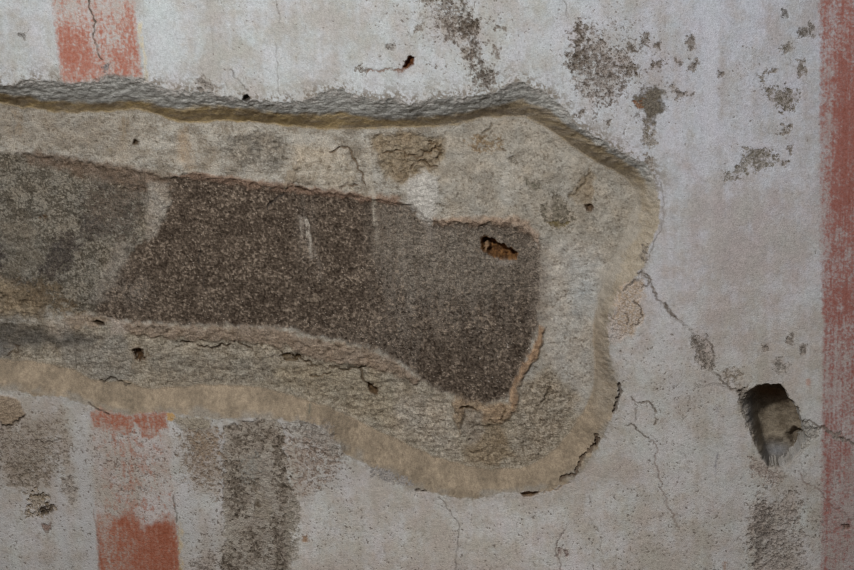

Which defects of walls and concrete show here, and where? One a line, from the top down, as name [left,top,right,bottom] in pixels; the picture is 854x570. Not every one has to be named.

crack [87,0,111,74]
spalling [650,33,701,73]
spalling [665,84,695,102]
spalling [721,19,821,185]
spalling [0,0,662,570]
crack [637,177,743,397]
peeling [689,332,812,570]